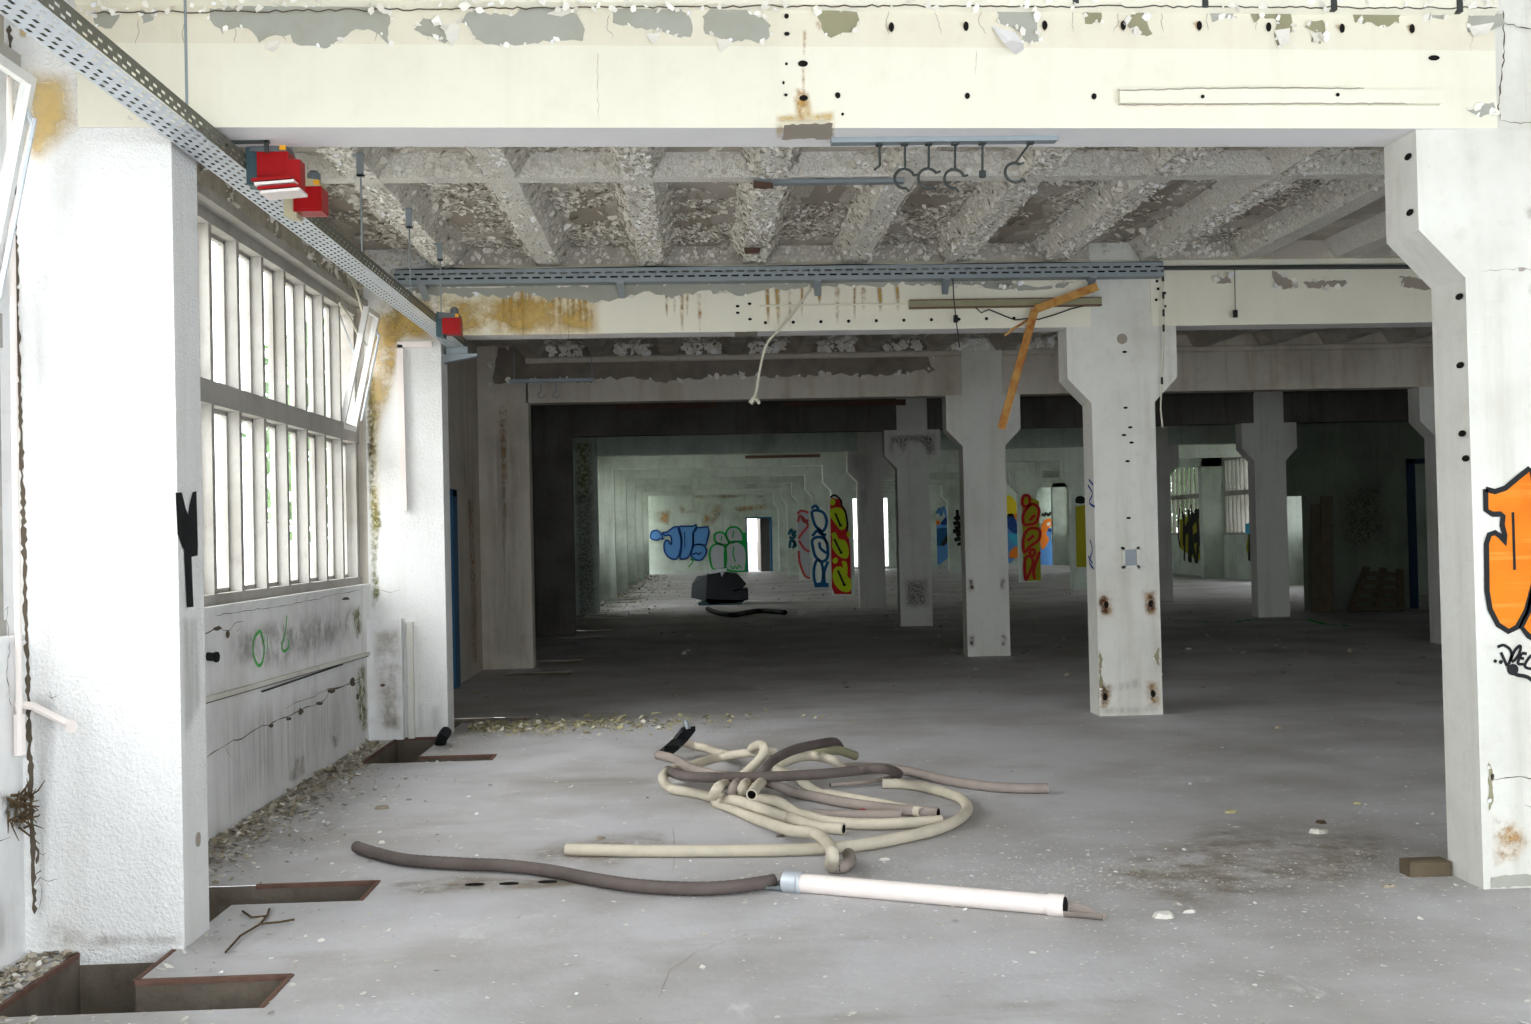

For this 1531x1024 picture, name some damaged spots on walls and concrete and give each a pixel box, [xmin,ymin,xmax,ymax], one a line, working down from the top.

crack [5,25,13,77]
peeling [80,0,1505,54]
crack [1470,12,1531,124]
leakage [33,83,65,151]
peeling [294,123,1384,304]
crack [0,186,58,914]
corrosion [1099,596,1110,614]
crack [207,676,364,757]